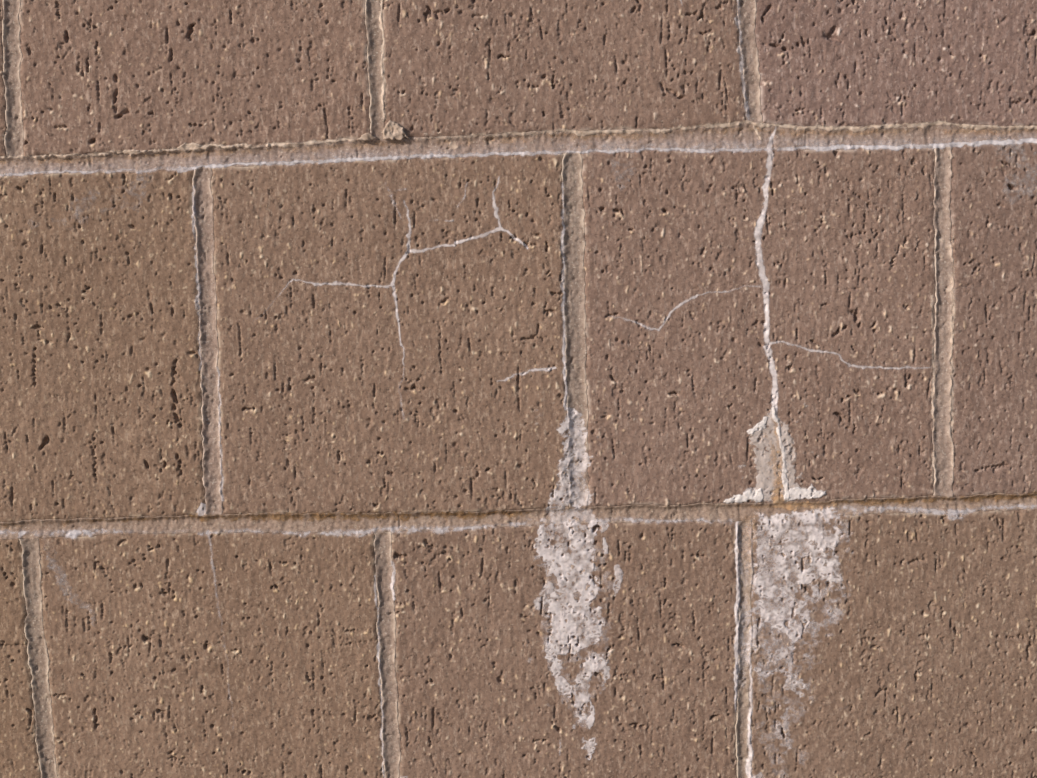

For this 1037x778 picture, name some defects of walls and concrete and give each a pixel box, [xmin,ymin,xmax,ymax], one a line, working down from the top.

crack [284,178,528,364]
crack [503,367,556,381]
crack [634,295,698,331]
crack [754,128,910,424]
damp [230,511,529,535]
damp [534,182,623,760]
damp [724,406,1037,778]
damp [376,637,384,775]